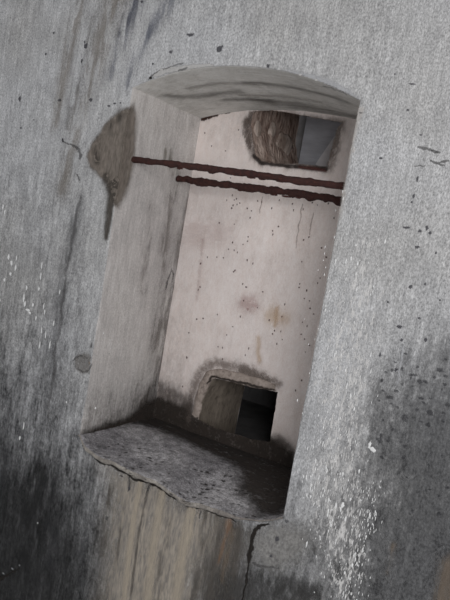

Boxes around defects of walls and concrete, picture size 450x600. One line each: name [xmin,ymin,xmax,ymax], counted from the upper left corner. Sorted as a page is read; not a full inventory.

water stain [187,361,280,421]
water stain [0,463,83,600]
water stain [106,475,314,600]
water stain [389,383,450,600]